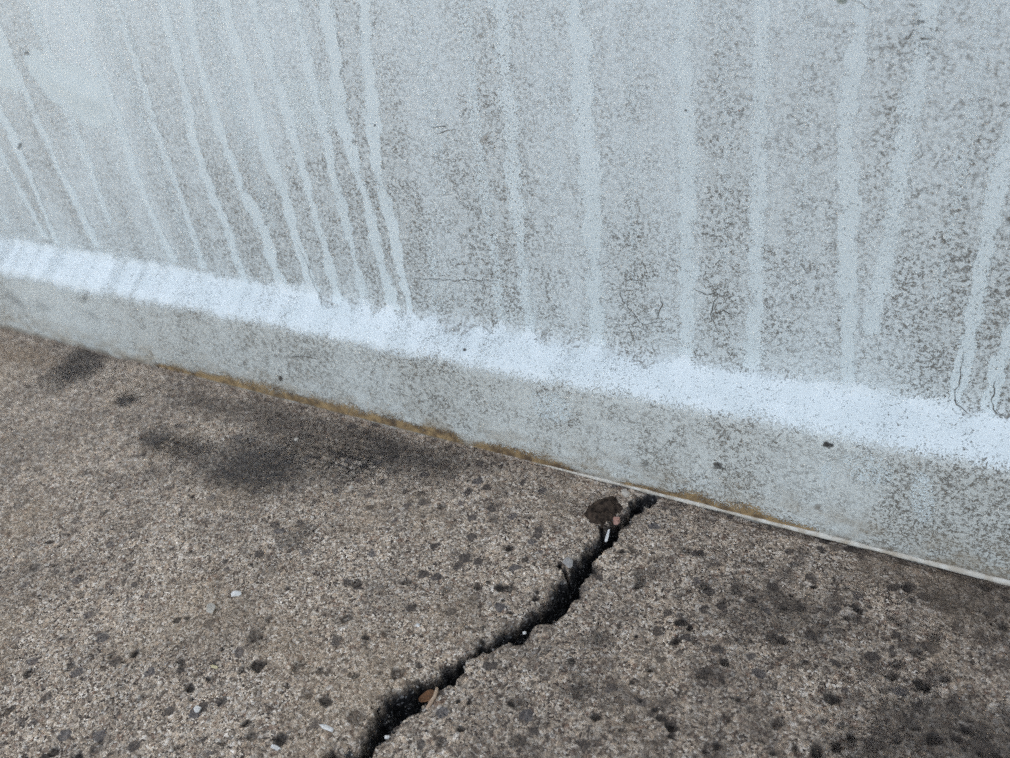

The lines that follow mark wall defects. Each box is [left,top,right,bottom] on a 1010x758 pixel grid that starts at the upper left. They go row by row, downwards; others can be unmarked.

water stain [0,0,1010,523]
crack [342,492,663,758]